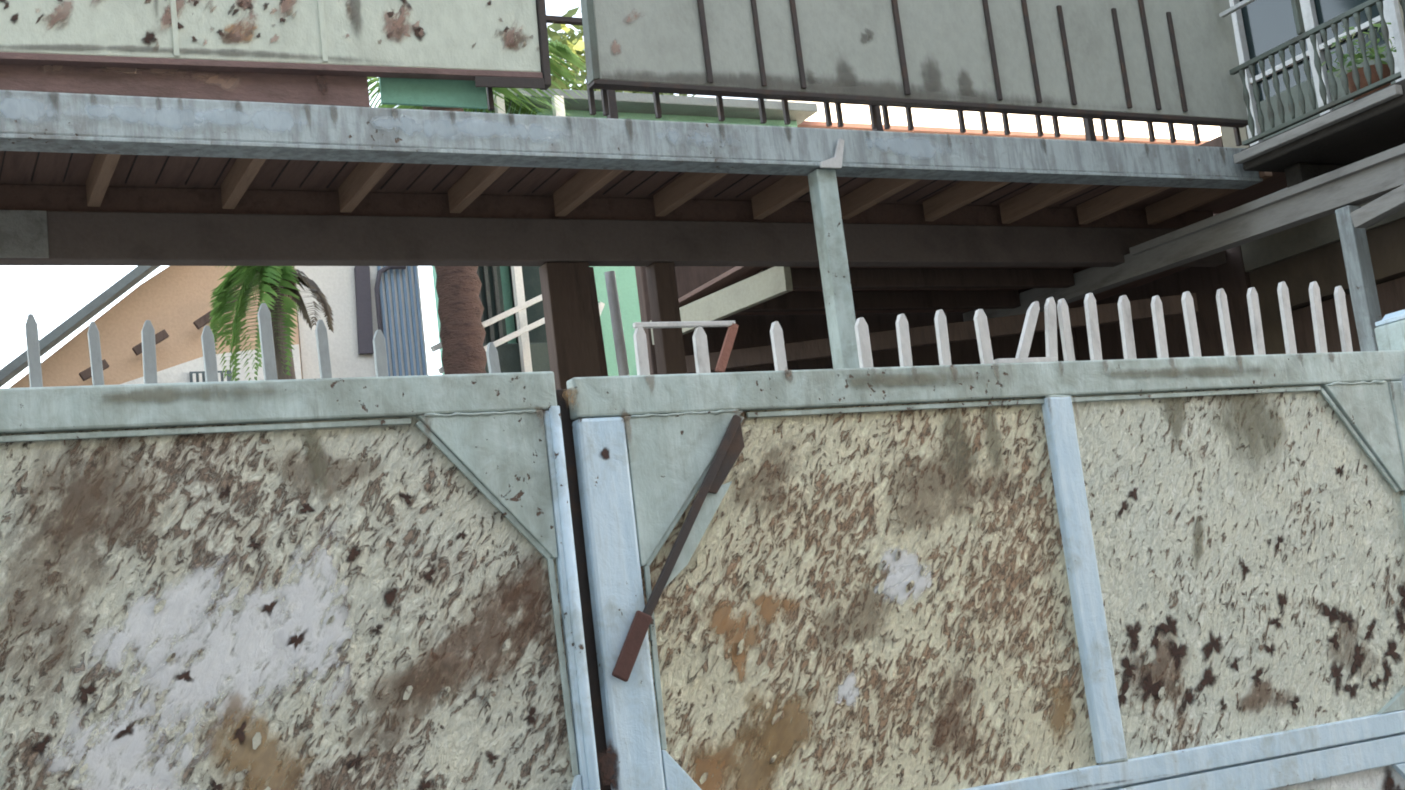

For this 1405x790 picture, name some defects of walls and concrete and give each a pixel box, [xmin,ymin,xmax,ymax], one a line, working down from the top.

spalling [142,32,157,44]